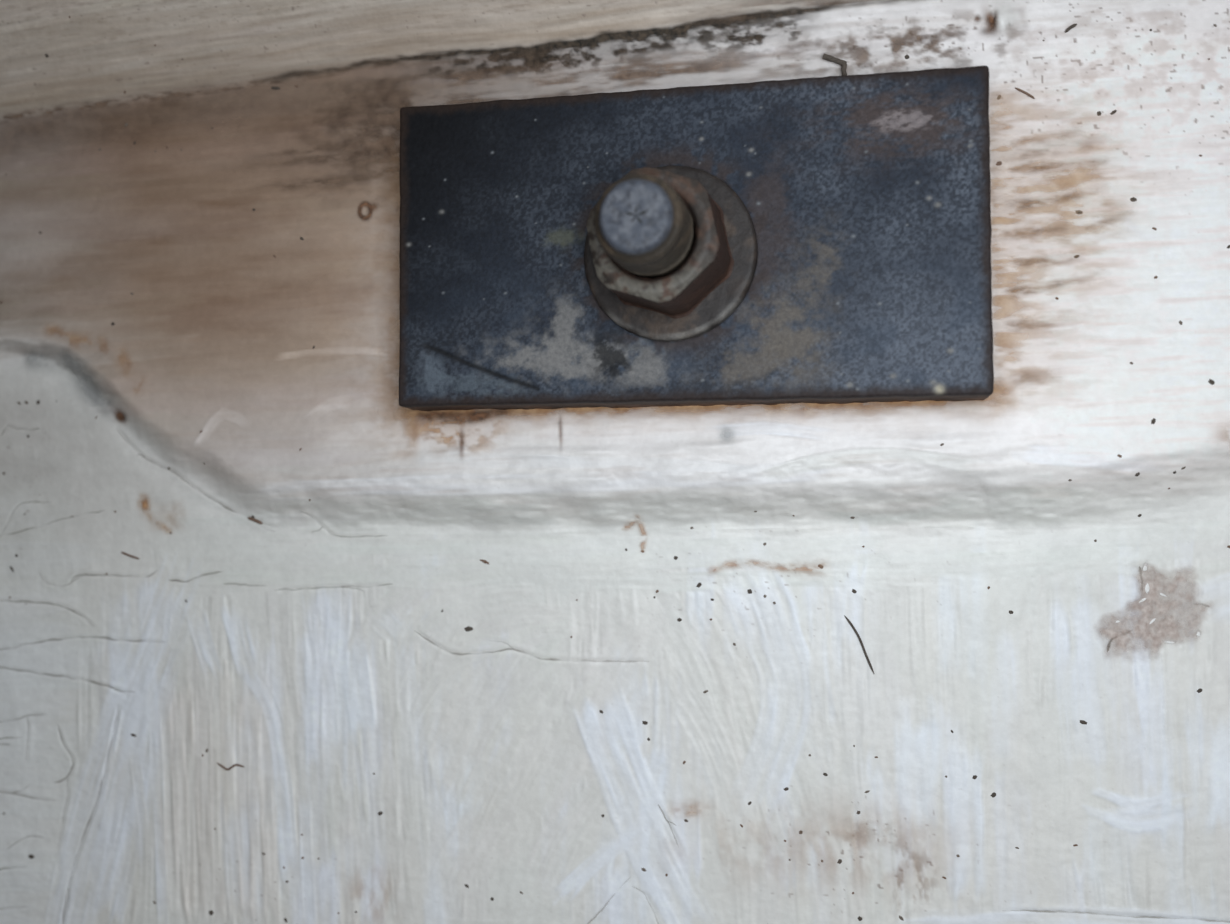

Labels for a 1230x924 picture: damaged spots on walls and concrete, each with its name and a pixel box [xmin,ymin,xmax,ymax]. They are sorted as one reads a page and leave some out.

leakage [63,356,104,405]
rust [395,390,950,442]
peeling [1100,563,1205,652]